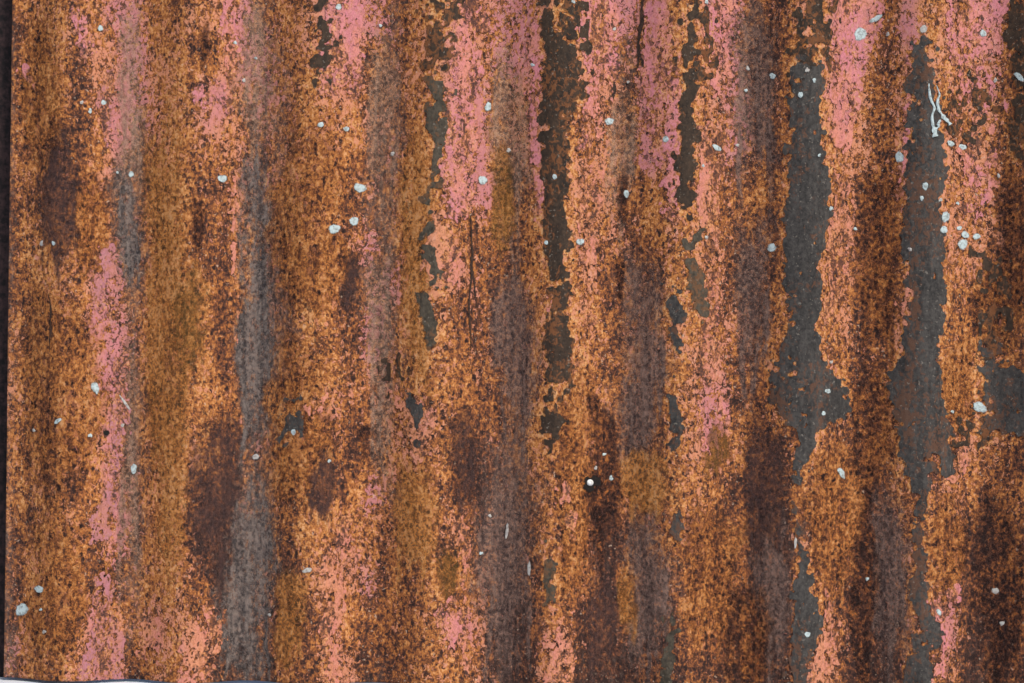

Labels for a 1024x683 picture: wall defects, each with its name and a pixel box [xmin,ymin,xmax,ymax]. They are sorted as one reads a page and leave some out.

corrosion [25,525,88,676]
corrosion [21,15,111,509]
corrosion [144,106,243,602]
peeling [415,0,492,351]
peeling [523,0,623,455]
corrosion [556,369,668,595]
peeling [637,0,739,387]
peeling [782,500,839,683]
peeling [766,0,885,486]
corrosion [801,171,905,683]
peeling [884,0,1024,683]
corrosion [931,484,1024,683]